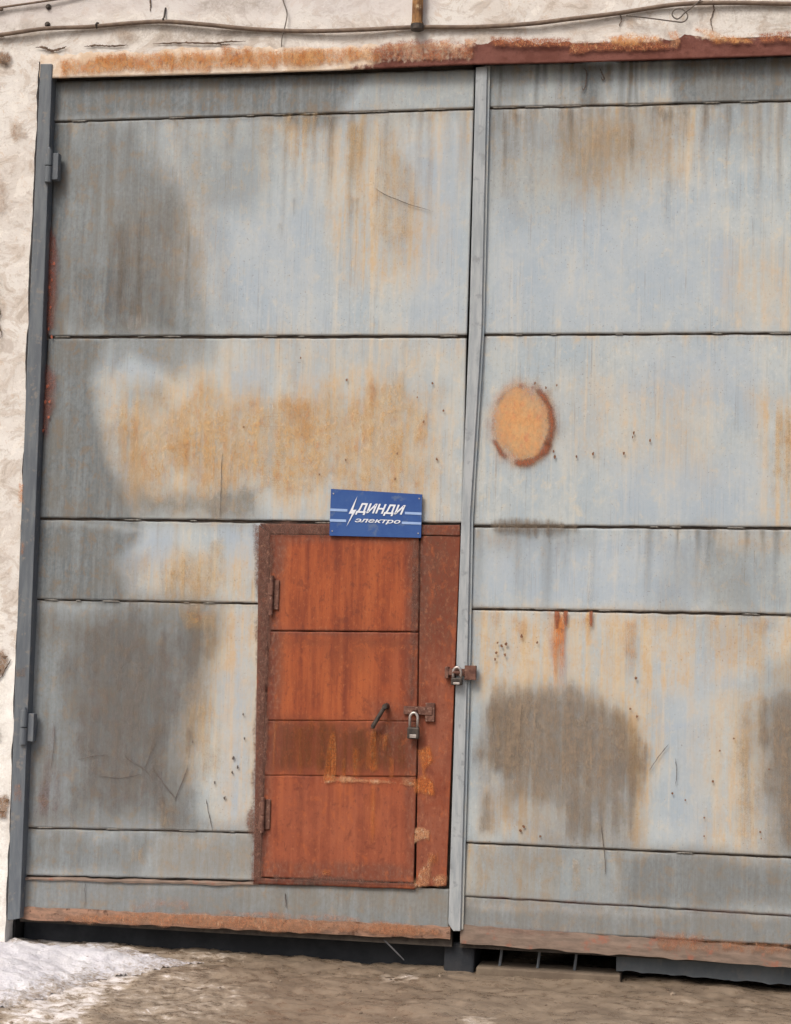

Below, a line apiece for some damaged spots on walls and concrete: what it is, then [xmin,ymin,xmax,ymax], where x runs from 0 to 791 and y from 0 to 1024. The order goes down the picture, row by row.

rust [61,39,472,75]
rust [493,381,557,466]
rust [553,611,568,661]
rust [414,748,434,795]
water stain [479,686,646,829]
rust [66,903,439,936]